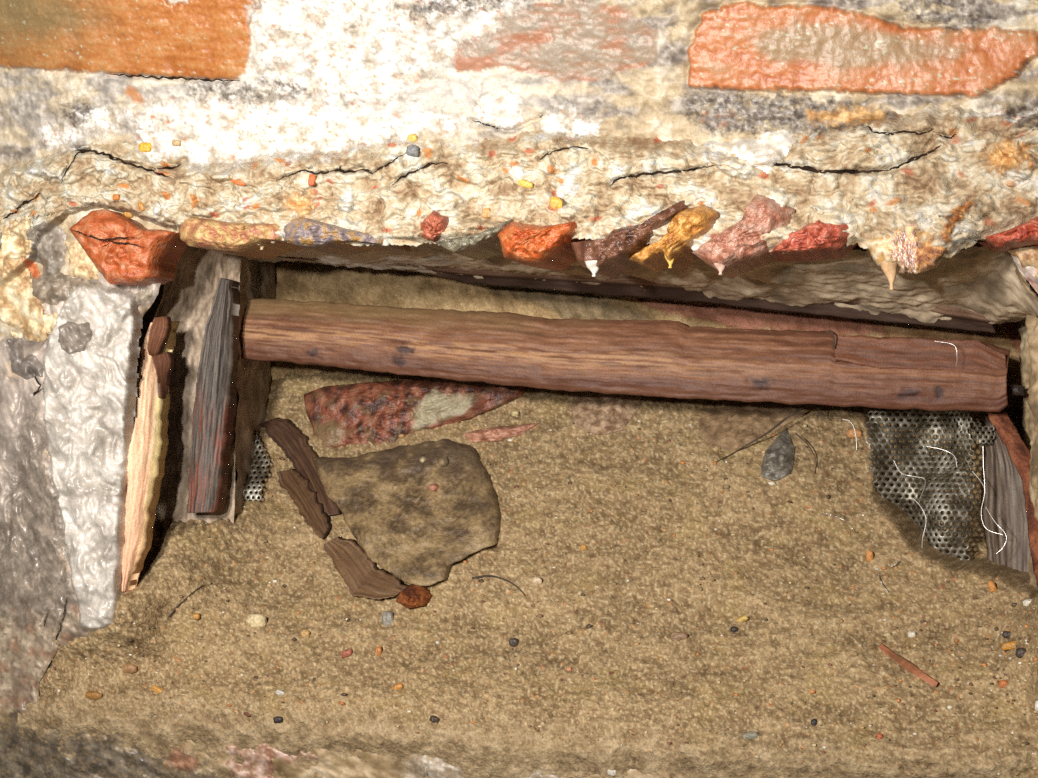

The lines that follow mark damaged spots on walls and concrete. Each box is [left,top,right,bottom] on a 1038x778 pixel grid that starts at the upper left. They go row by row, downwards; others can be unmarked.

crack [3,149,180,219]
crack [276,152,447,185]
crack [541,146,588,159]
crack [610,165,713,187]
crack [773,126,955,174]
spalling [0,96,1038,633]
spalling [1001,631,1027,658]